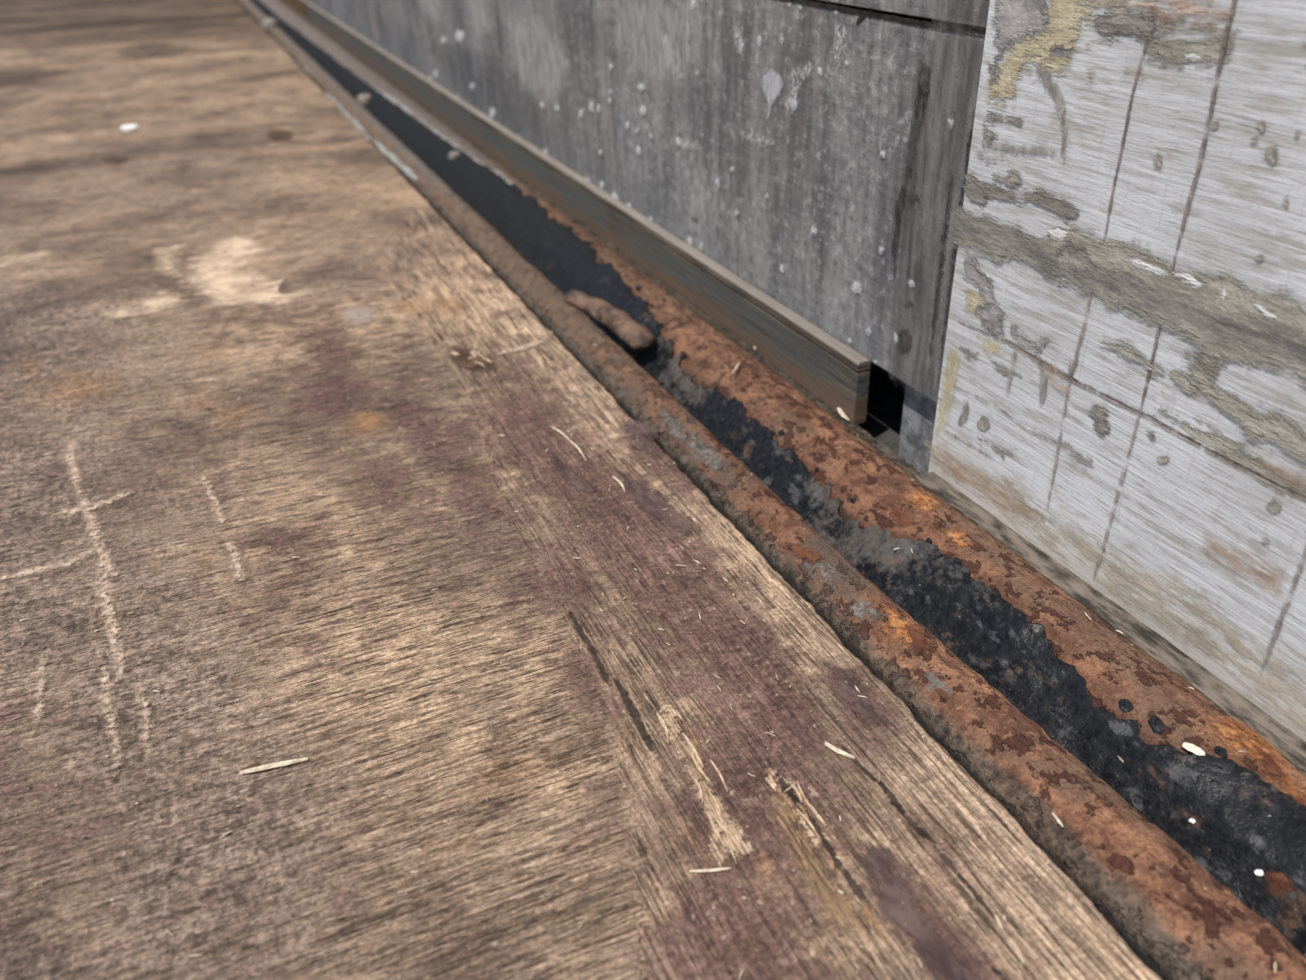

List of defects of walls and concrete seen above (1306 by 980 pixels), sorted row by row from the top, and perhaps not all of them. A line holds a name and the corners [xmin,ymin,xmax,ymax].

peeling [250,0,1306,957]
rust [947,531,972,548]
rust [887,609,930,654]
rust [1208,716,1306,806]
rust [1265,871,1296,898]